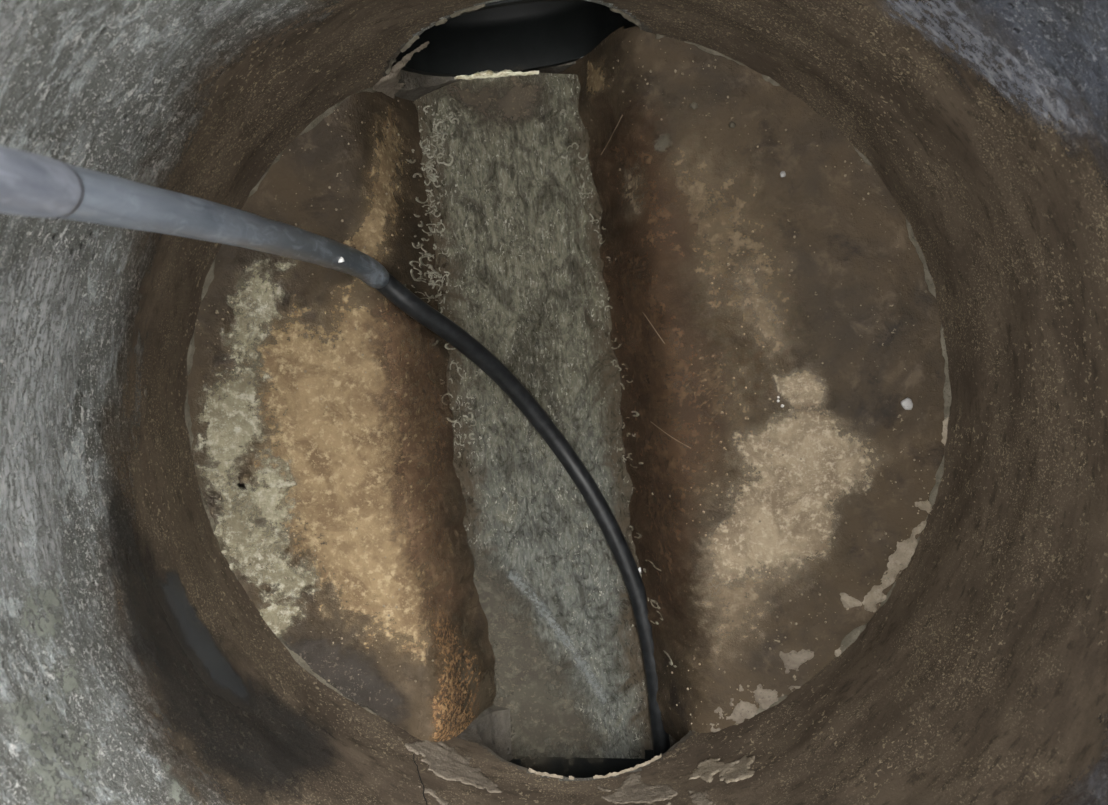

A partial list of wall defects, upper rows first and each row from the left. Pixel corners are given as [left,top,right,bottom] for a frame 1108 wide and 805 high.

crack [413,754,428,805]